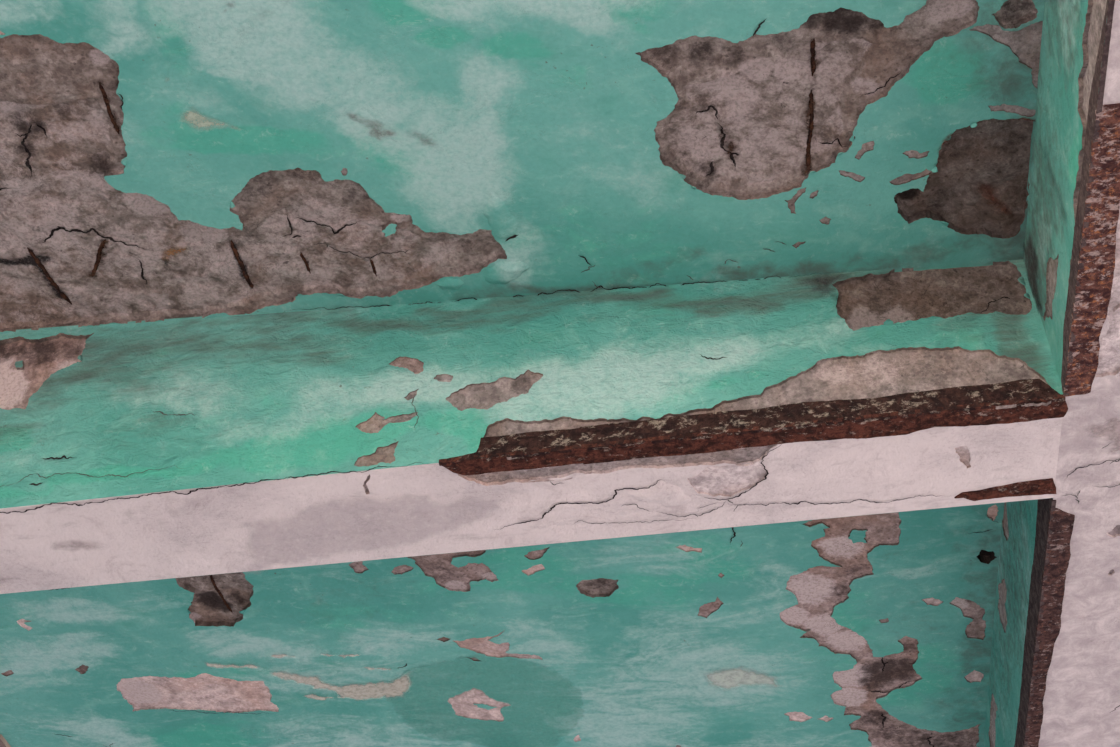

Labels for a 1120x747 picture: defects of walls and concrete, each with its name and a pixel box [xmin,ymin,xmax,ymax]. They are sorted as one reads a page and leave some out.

spalling [635,0,1043,214]
spalling [890,104,1036,239]
crack [39,226,147,284]
spalling [0,31,507,410]
crack [283,214,411,259]
spalling [832,254,1071,331]
peeling [389,357,543,411]
spalling [484,346,1052,437]
crack [495,444,937,547]
spalling [175,572,254,627]
peeling [780,512,1007,747]
peeling [117,673,279,713]